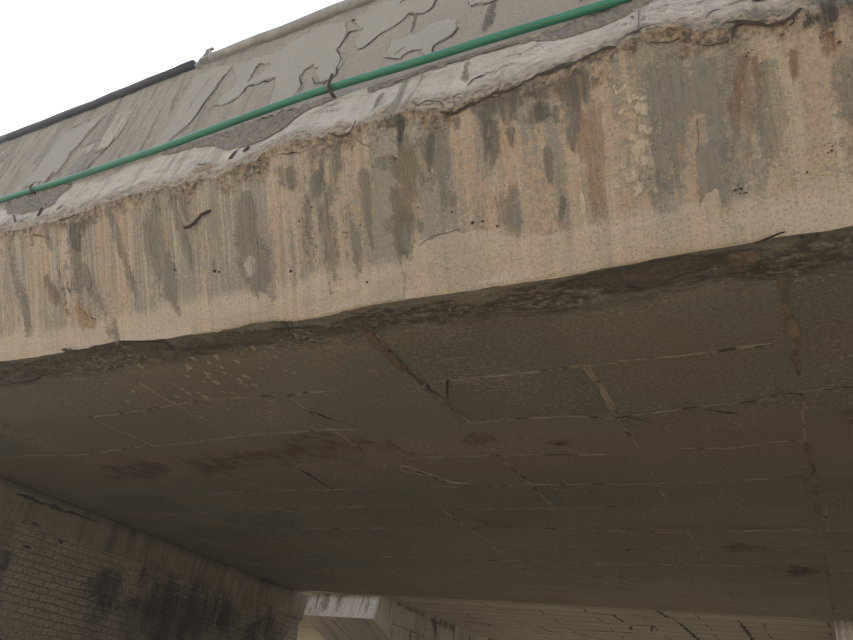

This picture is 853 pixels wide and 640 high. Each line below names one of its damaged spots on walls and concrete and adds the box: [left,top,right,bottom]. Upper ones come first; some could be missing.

peeling [151,0,459,159]
crack [329,120,370,147]
damp [374,77,412,152]
spalling [367,0,653,93]
damp [471,66,602,164]
damp [636,48,742,205]
damp [298,137,373,291]
peeling [184,74,785,349]
spalling [61,341,174,354]
crack [16,494,101,523]
crack [538,610,700,640]
crack [737,620,754,640]